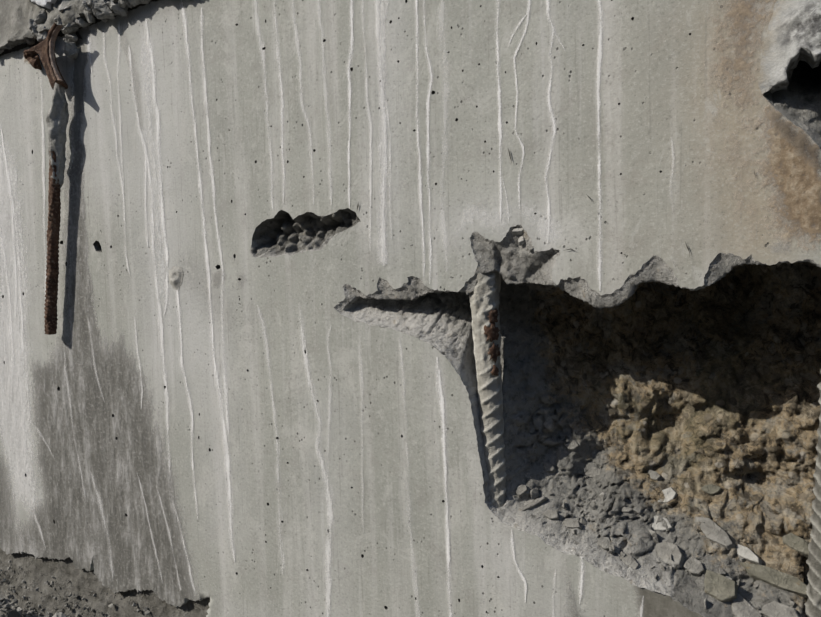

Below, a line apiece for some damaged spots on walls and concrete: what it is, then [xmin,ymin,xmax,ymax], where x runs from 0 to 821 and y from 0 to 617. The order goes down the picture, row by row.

leakage [0,21,198,607]
leakage [181,0,235,561]
spalling [250,208,361,258]
leakage [347,0,363,209]
leakage [415,0,433,275]
leakage [435,358,452,617]
corrosion [484,308,501,376]
leakage [496,0,530,221]
spalling [334,224,821,617]
corrosion [714,0,777,110]
corrosion [756,100,821,251]
spalling [763,53,821,150]